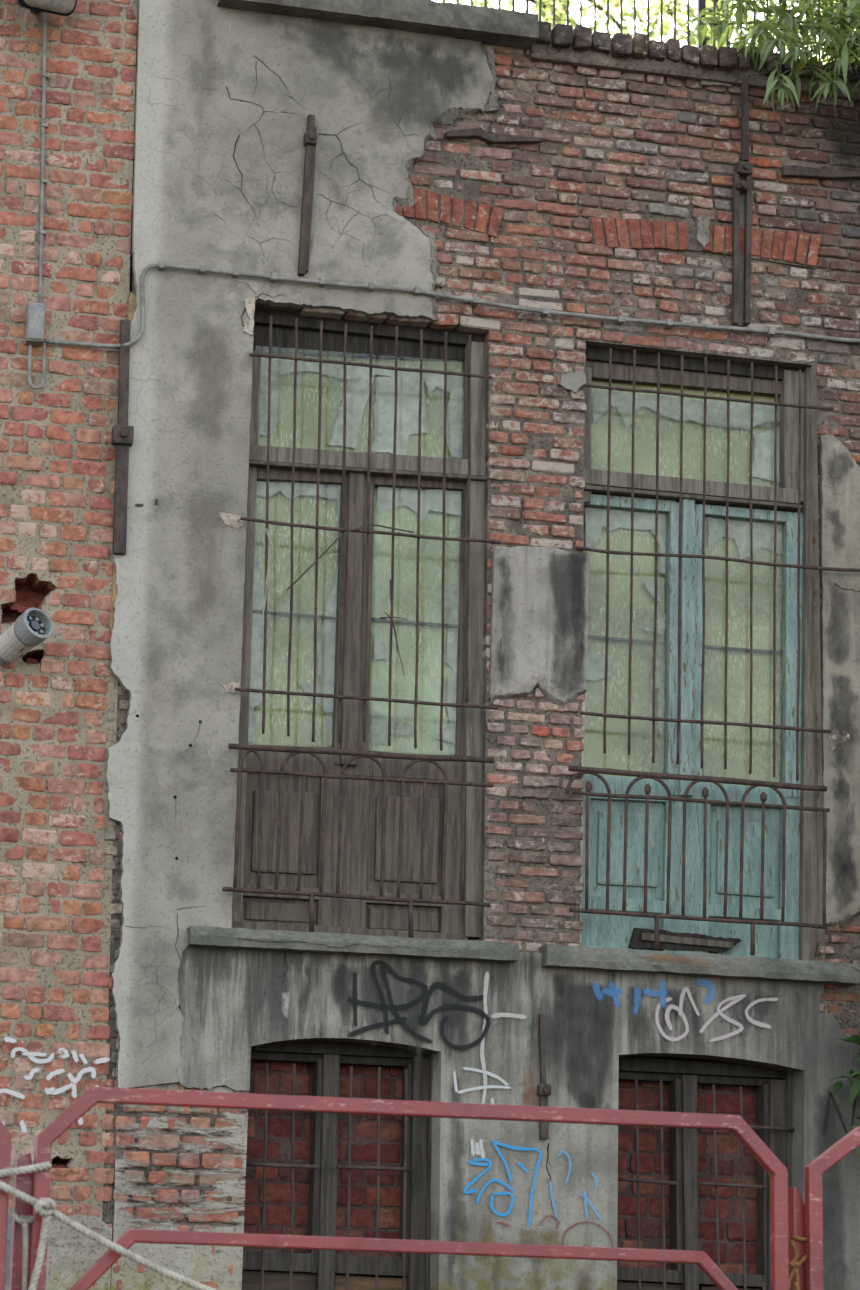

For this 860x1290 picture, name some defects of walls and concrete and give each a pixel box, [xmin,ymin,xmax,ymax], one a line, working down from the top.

crack [204,56,425,268]
flaking render [393,44,498,320]
flaking render [695,214,710,248]
crack [236,281,287,336]
hole [1,573,56,623]
leakage [552,555,584,691]